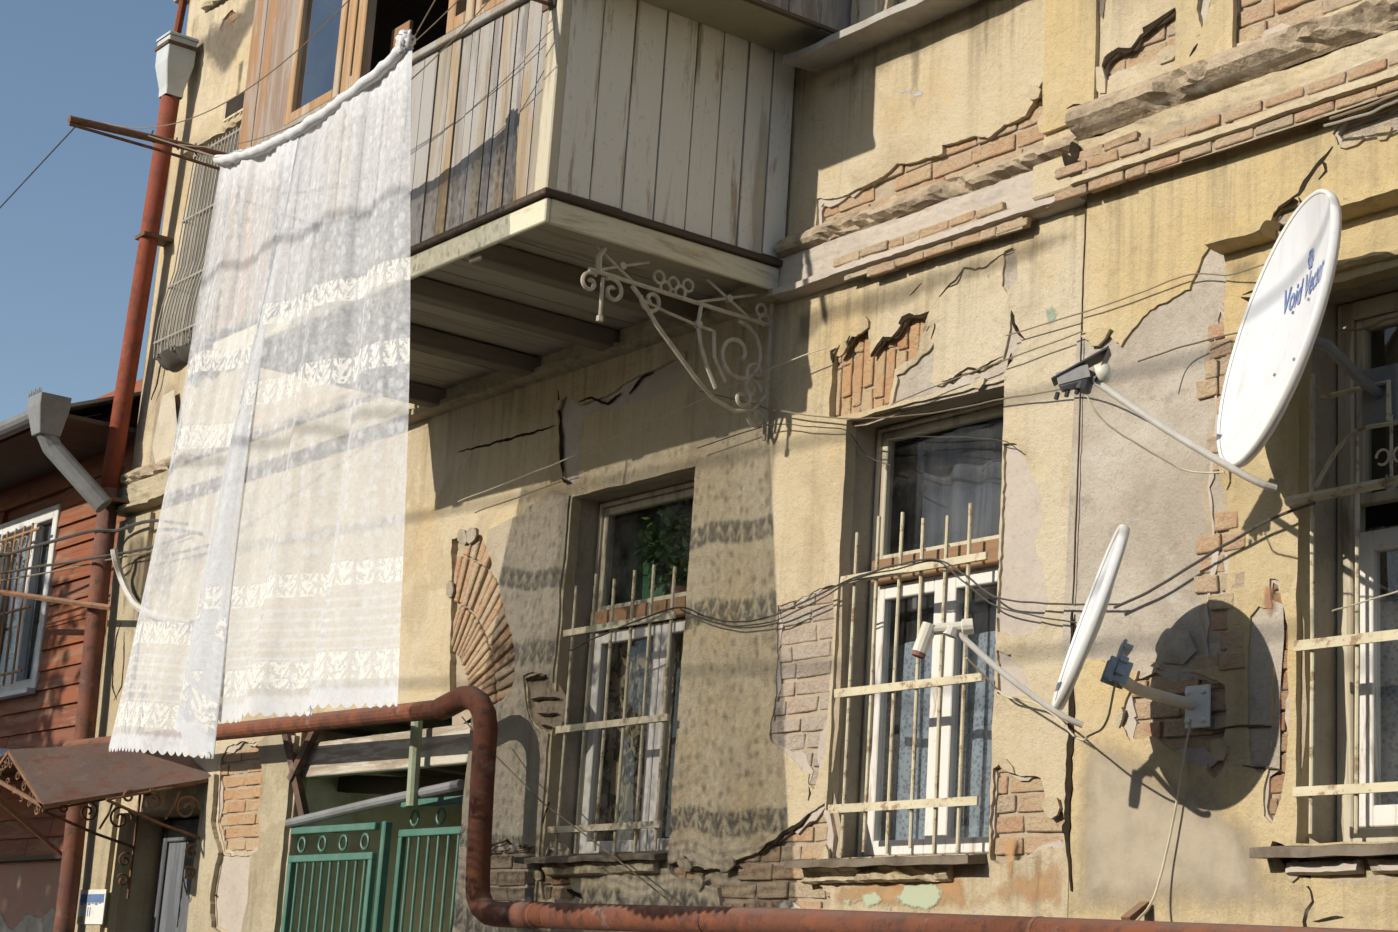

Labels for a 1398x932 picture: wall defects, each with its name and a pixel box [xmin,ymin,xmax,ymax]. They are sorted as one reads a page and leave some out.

spalling [1095,12,1176,94]
spalling [818,49,1398,292]
crack [1273,146,1333,217]
crack [457,372,654,484]
spalling [835,316,1022,426]
peeling [995,250,1307,822]
spalling [446,527,566,737]
spalling [771,585,842,788]
spalling [217,741,262,932]
crack [684,787,811,871]
spalling [671,793,841,909]
spalling [991,757,1065,864]